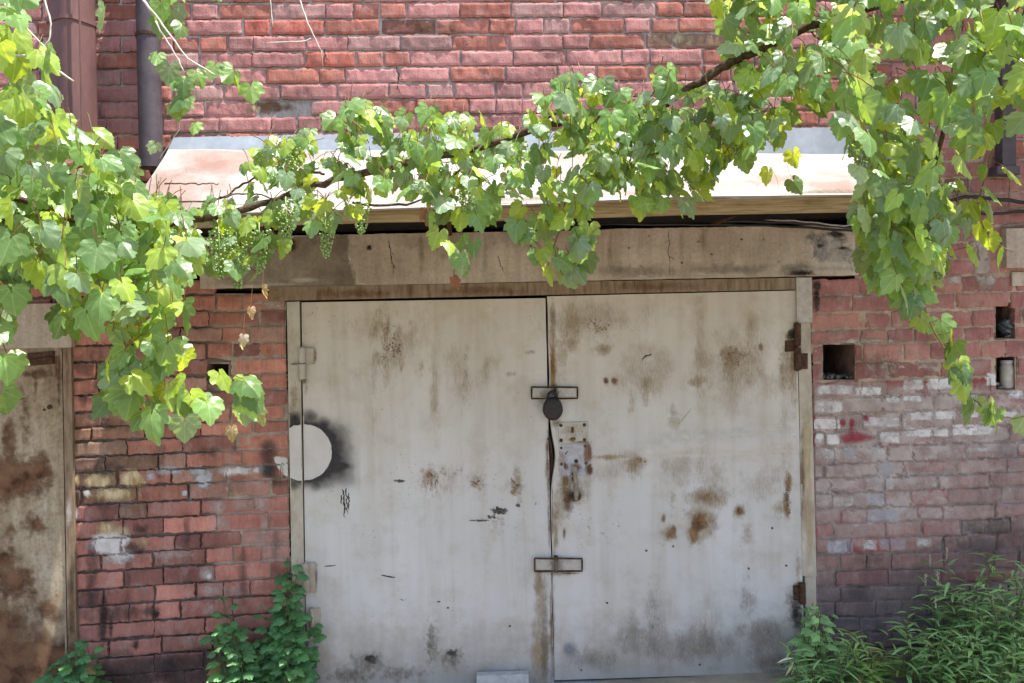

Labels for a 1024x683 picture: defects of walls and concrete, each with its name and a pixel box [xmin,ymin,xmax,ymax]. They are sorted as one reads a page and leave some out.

damp [75,471,144,500]
damp [222,467,263,475]
corrosion [549,437,592,544]
corrosion [689,491,722,541]
damp [91,522,146,564]
corrosion [533,578,553,666]